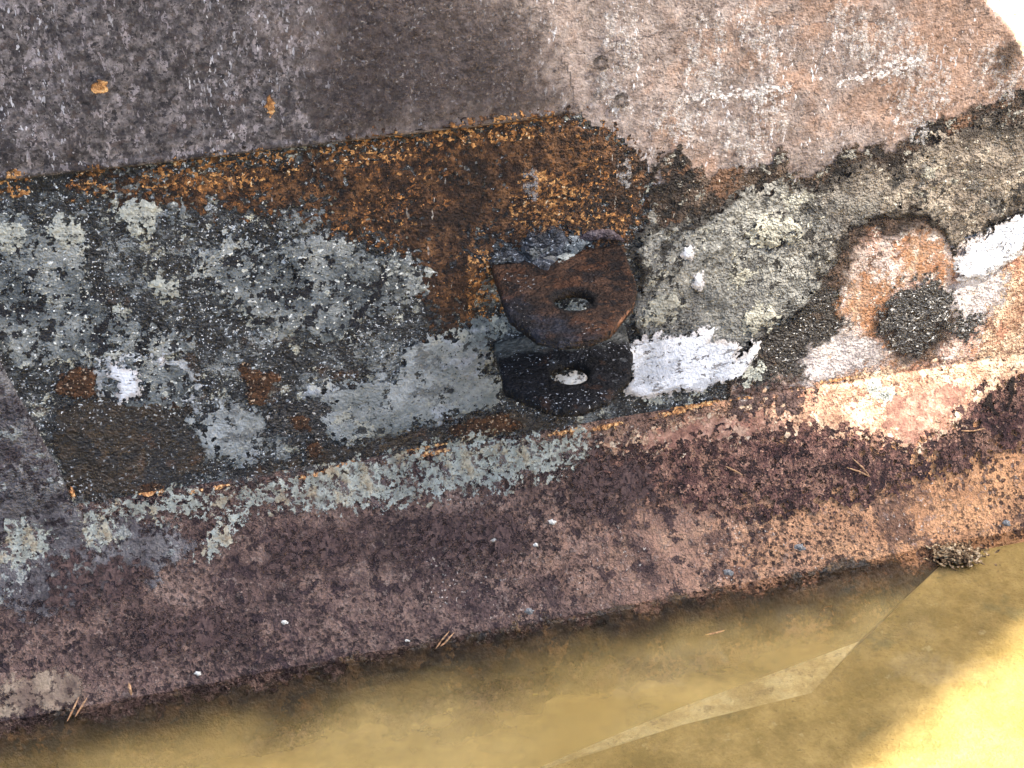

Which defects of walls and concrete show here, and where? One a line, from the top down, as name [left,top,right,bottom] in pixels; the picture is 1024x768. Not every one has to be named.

rust [0,169,31,199]
rust [66,102,666,343]
damp [643,88,1024,231]
damp [263,396,334,449]
damp [556,205,1024,533]
damp [0,347,278,668]
damp [255,499,540,590]